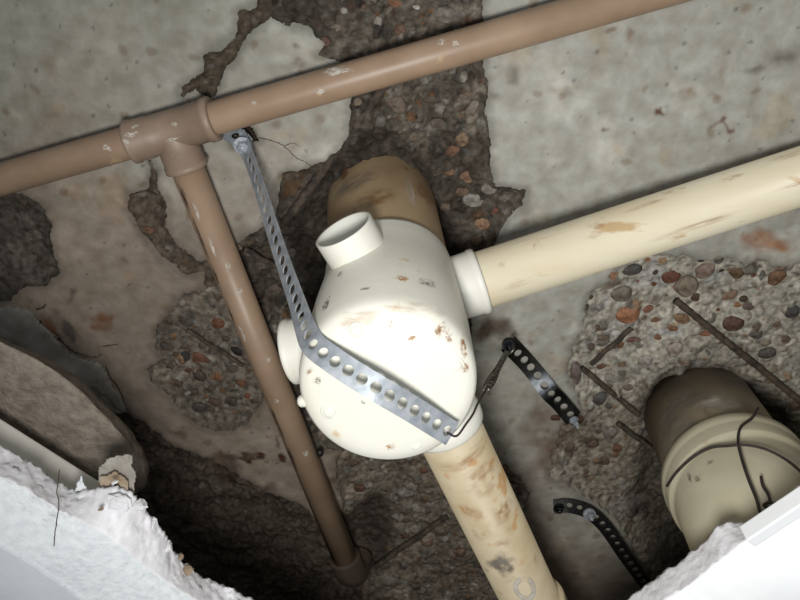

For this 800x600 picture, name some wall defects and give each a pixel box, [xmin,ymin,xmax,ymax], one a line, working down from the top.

spalling [181,0,484,98]
spalling [0,193,60,302]
spalling [128,160,264,431]
spalling [232,60,526,357]
peeling [75,475,87,491]
spalling [98,379,498,600]
spalling [501,464,529,509]
spalling [549,254,800,582]